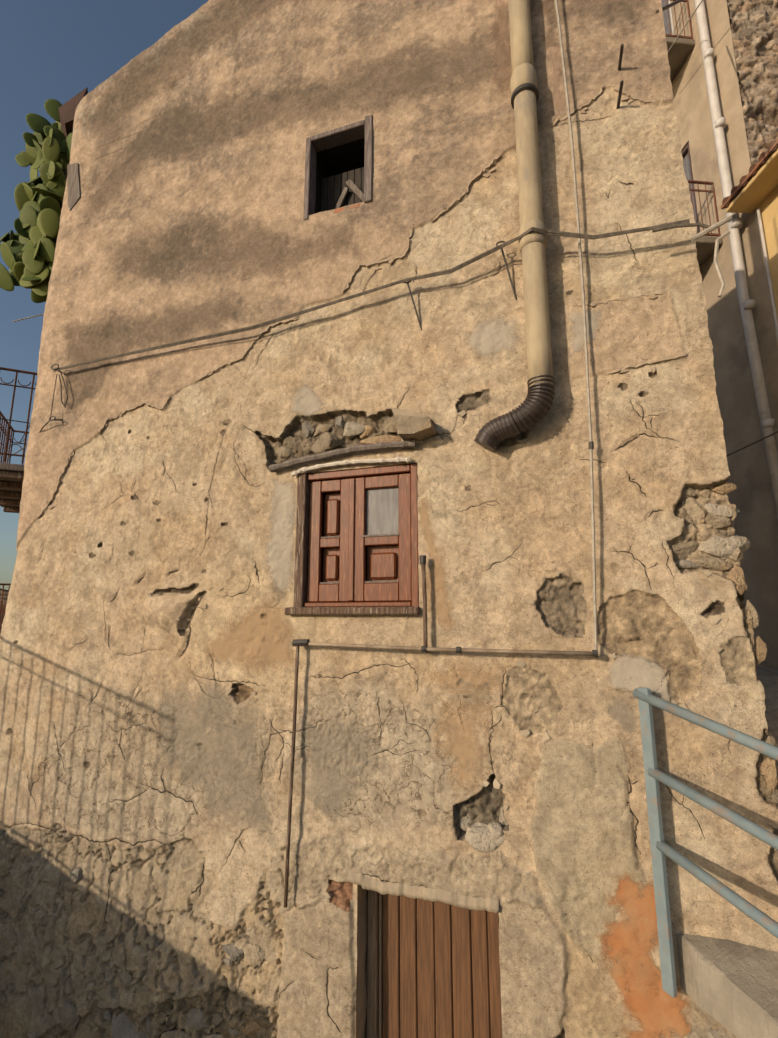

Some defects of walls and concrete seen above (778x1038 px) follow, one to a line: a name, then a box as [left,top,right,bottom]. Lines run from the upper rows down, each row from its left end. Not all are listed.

spalling [255,409,401,472]
spalling [455,389,491,418]
crack [200,425,269,555]
crack [225,562,279,608]
spalling [666,476,767,688]
spalling [527,572,702,710]
spalling [501,660,563,742]
crack [3,577,265,929]
crack [260,716,324,785]
spalling [453,774,509,853]
corrosion [601,875,690,1038]
spalling [27,978,277,1038]